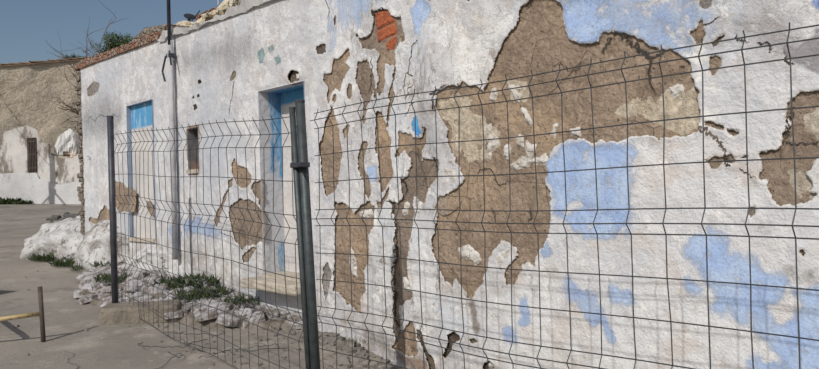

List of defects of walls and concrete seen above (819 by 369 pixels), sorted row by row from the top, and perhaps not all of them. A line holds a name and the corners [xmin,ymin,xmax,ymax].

flaking render [784,29,819,71]
flaking render [169,159,266,262]
flaking render [316,0,739,369]
flaking render [704,153,746,170]
flaking render [759,90,819,206]
peeling [683,227,819,369]